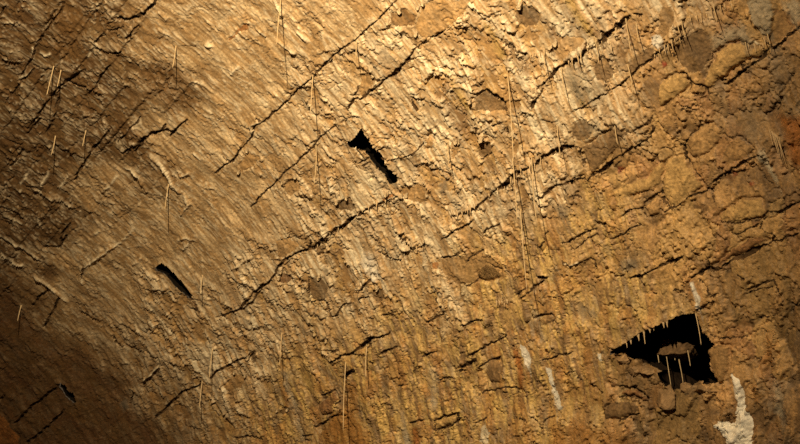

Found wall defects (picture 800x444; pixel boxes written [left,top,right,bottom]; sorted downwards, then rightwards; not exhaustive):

crack [5,0,157,167]
crack [215,0,397,174]
crack [250,27,449,207]
spalling [348,128,427,203]
spalling [156,263,192,298]
crack [221,196,398,318]
spalling [610,313,730,390]
water stain [713,373,754,444]